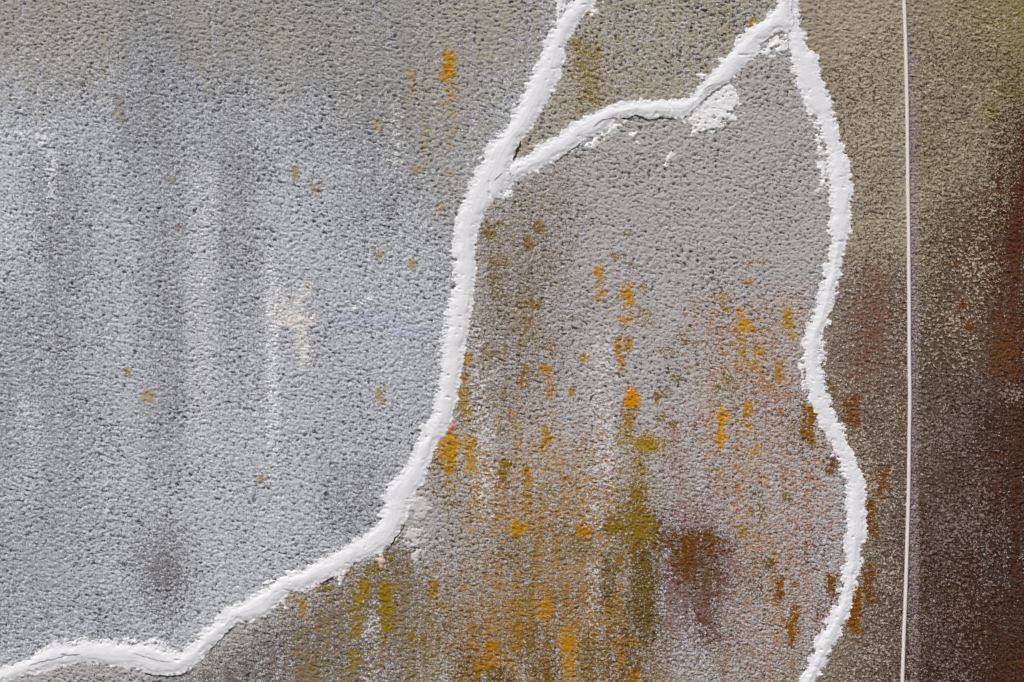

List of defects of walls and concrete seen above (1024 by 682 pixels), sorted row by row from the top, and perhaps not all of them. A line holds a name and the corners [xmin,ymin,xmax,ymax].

rust [408,46,460,176]
crack [0,0,597,682]
rust [423,249,878,682]
crack [501,0,869,682]
rust [825,253,896,431]
rust [865,463,893,546]
rust [945,88,1024,682]